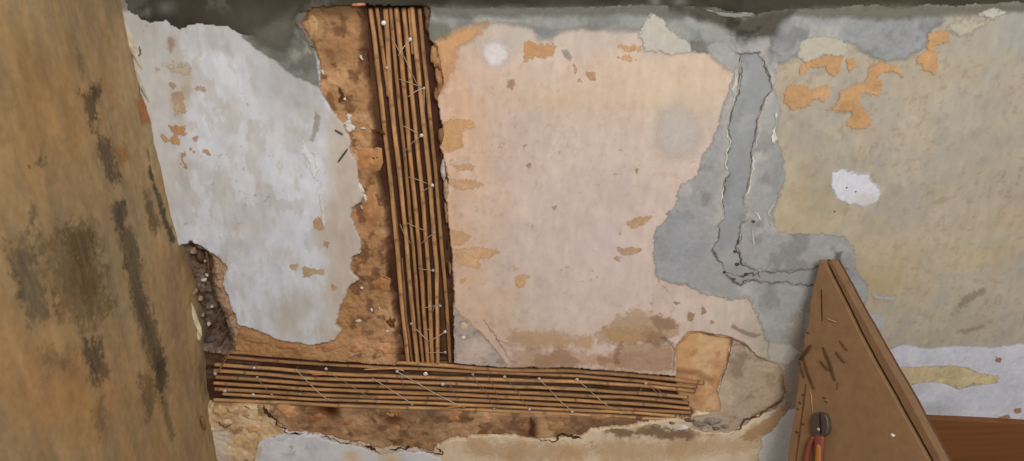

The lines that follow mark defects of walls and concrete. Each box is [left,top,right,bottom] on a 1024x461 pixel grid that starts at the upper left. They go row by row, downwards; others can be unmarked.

leakage [138,98,151,122]
peeling [160,64,211,169]
peeling [524,29,556,62]
peeling [617,13,740,70]
peeling [784,35,905,130]
flaking render [233,3,410,365]
flaking render [424,6,500,339]
crack [712,52,819,287]
leakage [154,349,167,390]
flaking render [191,303,202,341]
flaking render [208,307,800,461]
leakage [510,311,678,371]